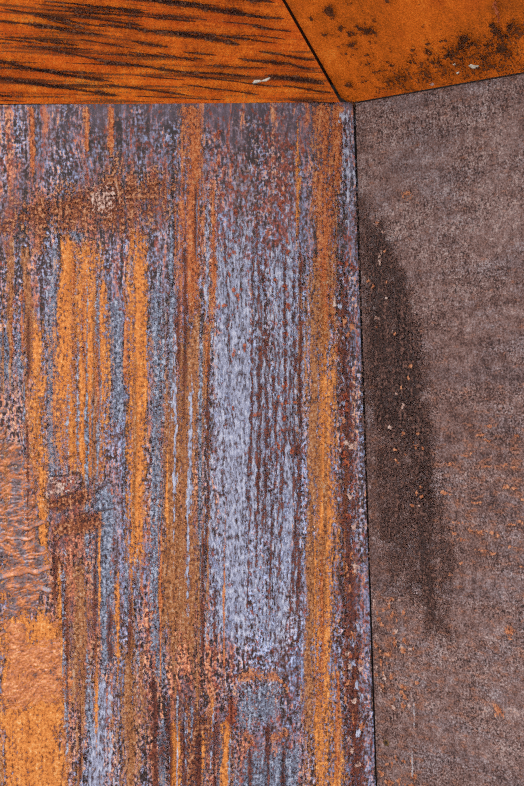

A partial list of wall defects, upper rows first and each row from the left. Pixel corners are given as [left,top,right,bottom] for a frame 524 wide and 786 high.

rust [0,105,290,786]
rust [273,103,419,786]
damp [353,191,462,644]